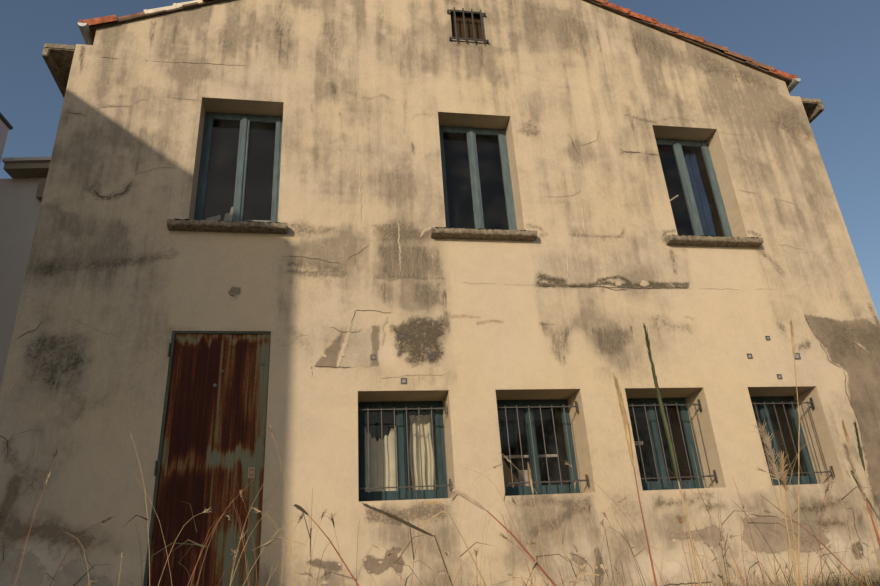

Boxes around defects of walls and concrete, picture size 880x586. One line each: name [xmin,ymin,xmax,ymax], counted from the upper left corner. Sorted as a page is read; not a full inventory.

peeling [315,334,342,367]
peeling [371,326,379,365]